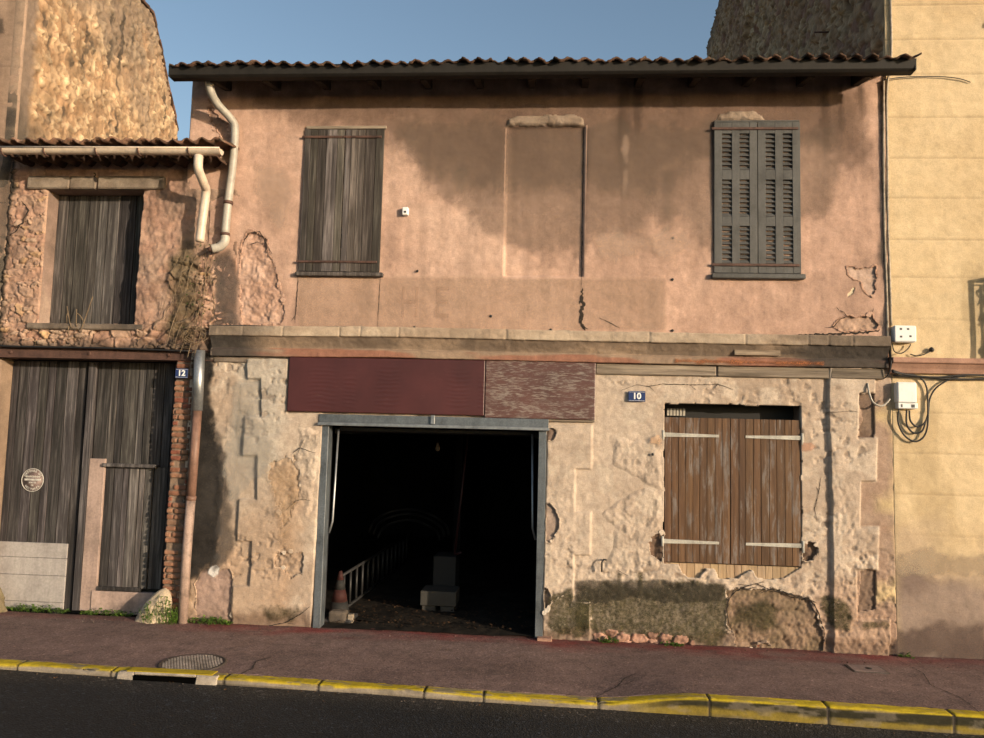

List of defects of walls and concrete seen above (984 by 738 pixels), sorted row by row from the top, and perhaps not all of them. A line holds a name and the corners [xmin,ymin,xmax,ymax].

crack [579,131,619,330]
flaking render [845,264,878,298]
flaking render [832,311,881,333]
spalling [546,426,557,443]
spalling [544,502,562,545]
spalling [647,529,666,564]
spalling [801,540,820,563]